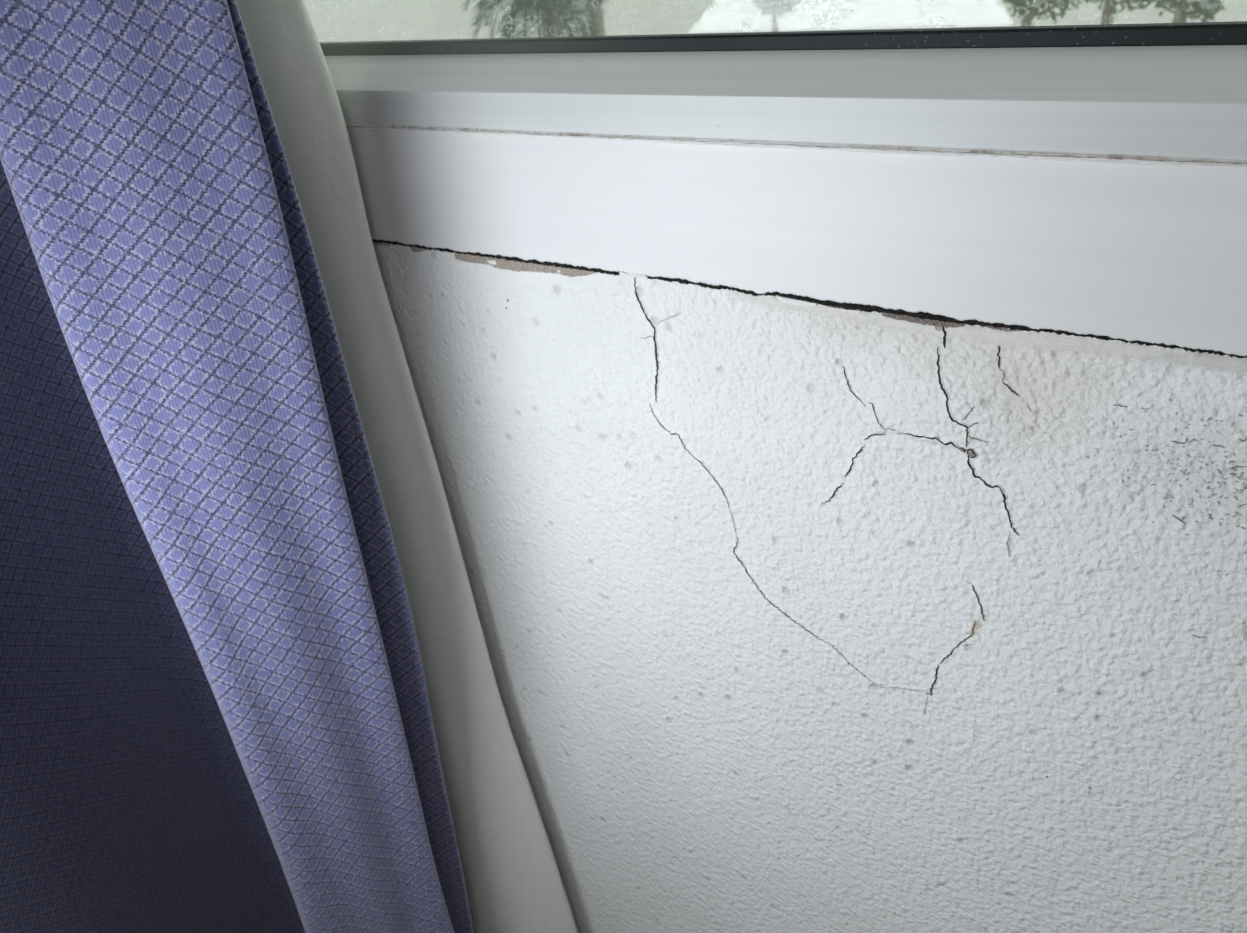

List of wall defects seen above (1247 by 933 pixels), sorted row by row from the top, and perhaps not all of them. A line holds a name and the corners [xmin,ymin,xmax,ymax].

crack [372,239,1247,714]